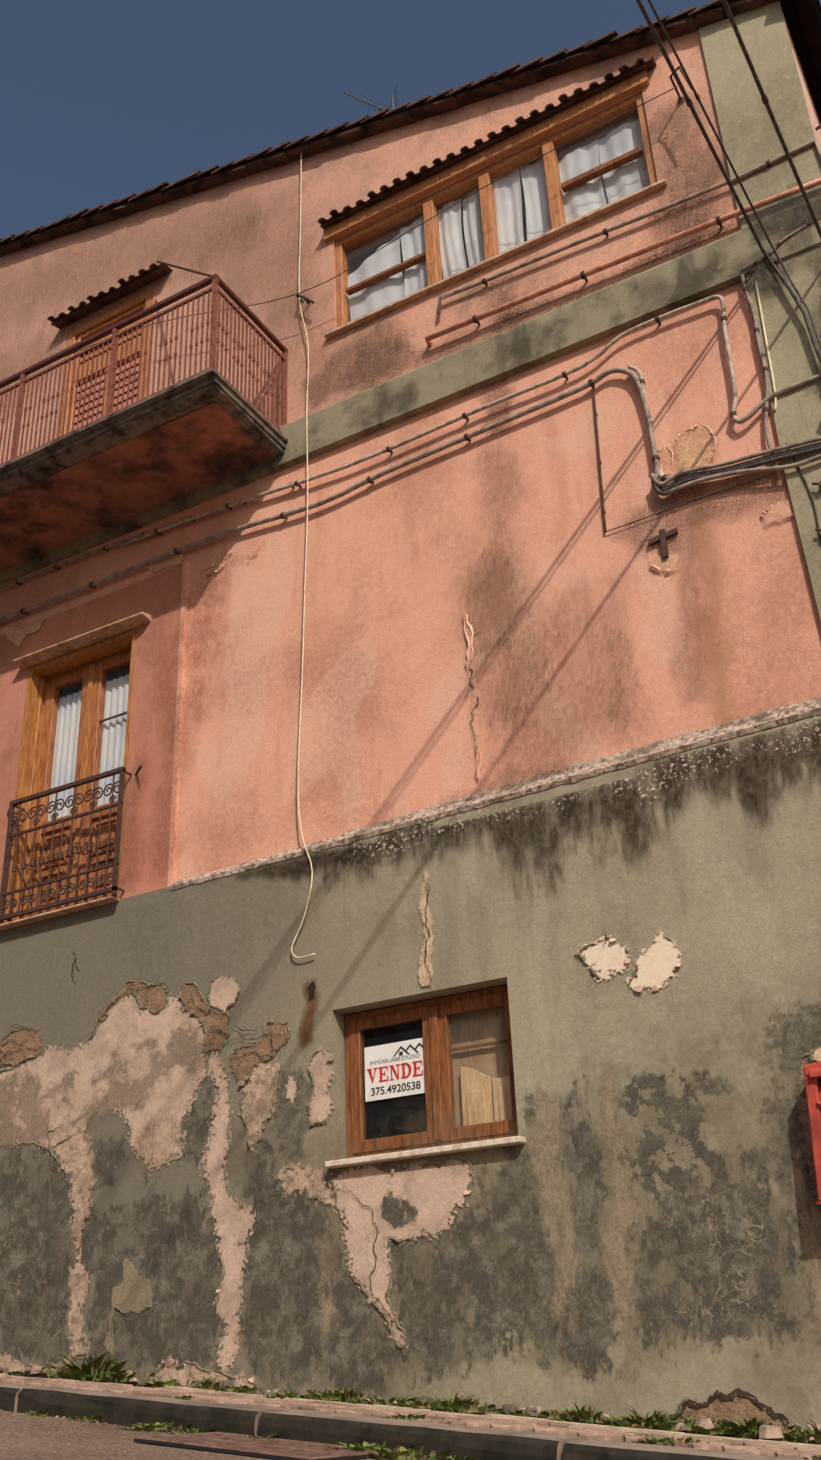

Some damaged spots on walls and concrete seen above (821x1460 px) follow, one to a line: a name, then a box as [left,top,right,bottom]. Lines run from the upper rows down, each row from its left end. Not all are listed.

spalling [657,422,719,476]
crack [462,620,485,780]
damp [653,718,821,820]
damp [237,779,650,987]
spalling [575,925,681,993]
spalling [0,979,335,1172]
damp [767,1003,821,1082]
spalling [272,1155,476,1349]
damp [0,1050,821,1398]
spalling [0,1351,69,1378]
spalling [672,1388,802,1431]